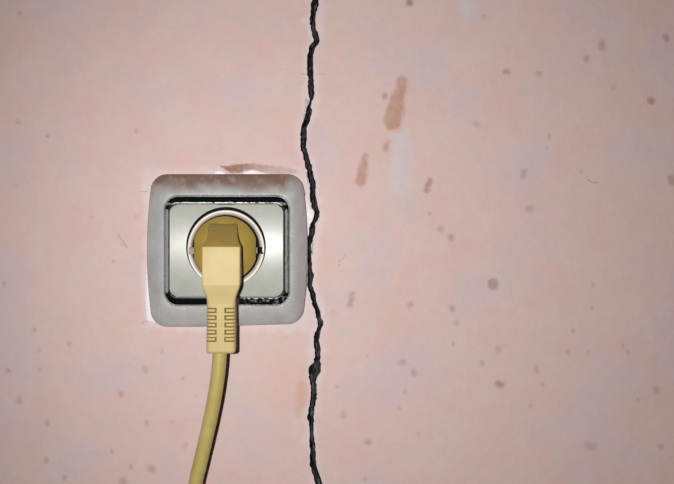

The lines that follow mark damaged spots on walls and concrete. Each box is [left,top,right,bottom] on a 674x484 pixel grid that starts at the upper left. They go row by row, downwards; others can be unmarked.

damp [380,73,410,154]
damp [353,151,371,189]
crack [300,0,327,484]